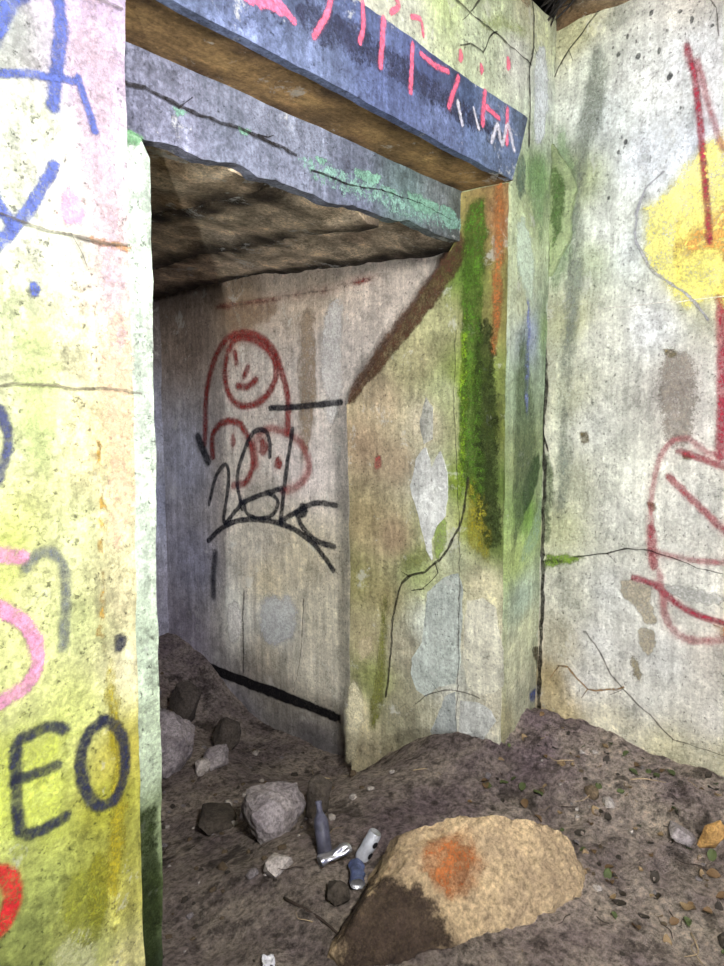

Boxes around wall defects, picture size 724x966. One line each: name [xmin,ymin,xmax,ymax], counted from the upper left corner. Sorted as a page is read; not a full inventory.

crack [457,0,600,147]
water stain [457,47,605,556]
crack [385,331,480,726]
crack [536,349,724,756]